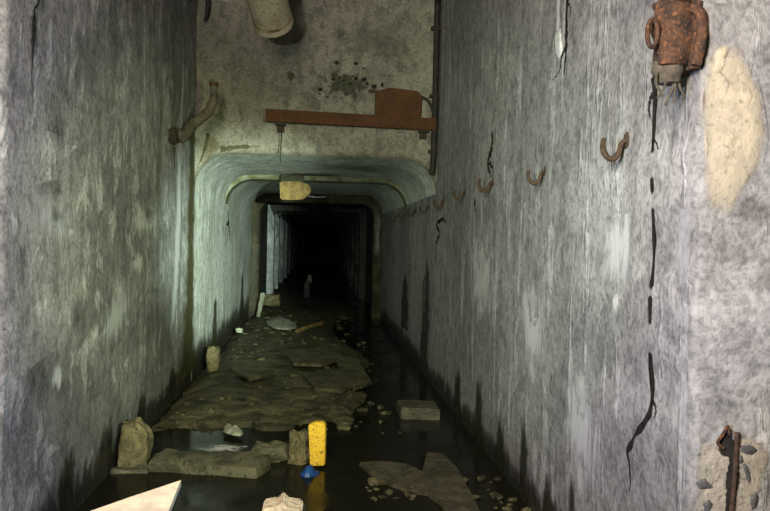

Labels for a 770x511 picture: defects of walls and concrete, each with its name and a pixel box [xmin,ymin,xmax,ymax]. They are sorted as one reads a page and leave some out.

crack [31,0,40,101]
mould [318,61,384,102]
crack [648,76,659,153]
crack [647,177,655,324]
crack [626,352,657,491]
spalling [695,425,768,511]